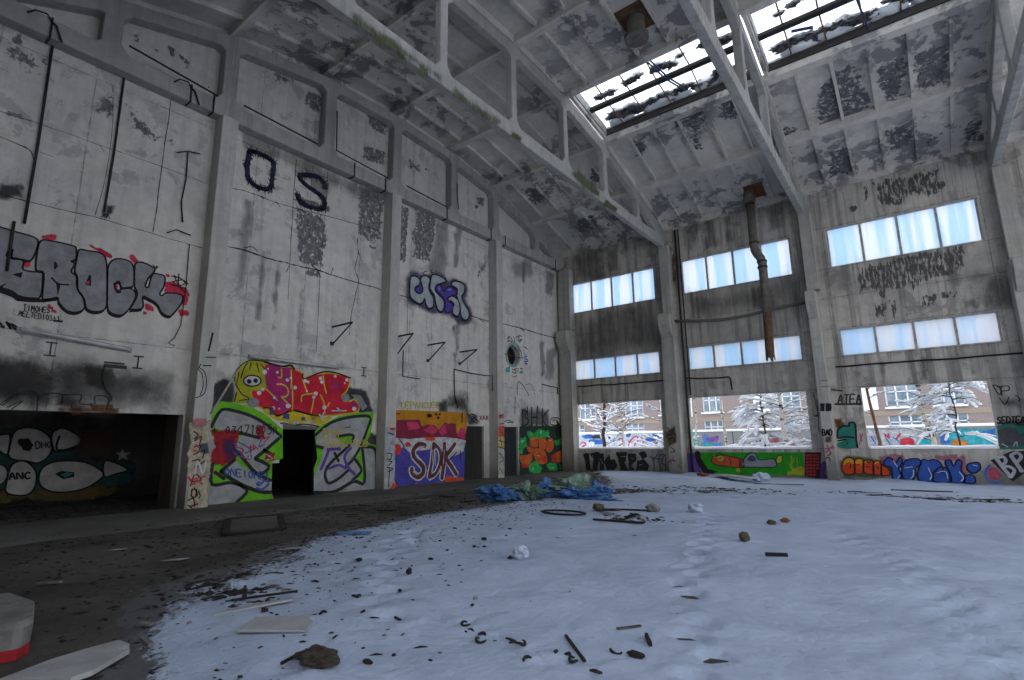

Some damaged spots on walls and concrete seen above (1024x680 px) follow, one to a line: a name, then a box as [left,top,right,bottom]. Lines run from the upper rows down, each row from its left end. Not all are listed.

peeling [812,43,954,125]
peeling [885,125,912,150]
peeling [960,119,984,141]
peeling [829,146,858,177]
peeling [850,165,945,212]
peeling [293,197,330,277]
peeling [356,184,385,249]
peeling [857,244,966,319]
leakage [85,365,142,389]